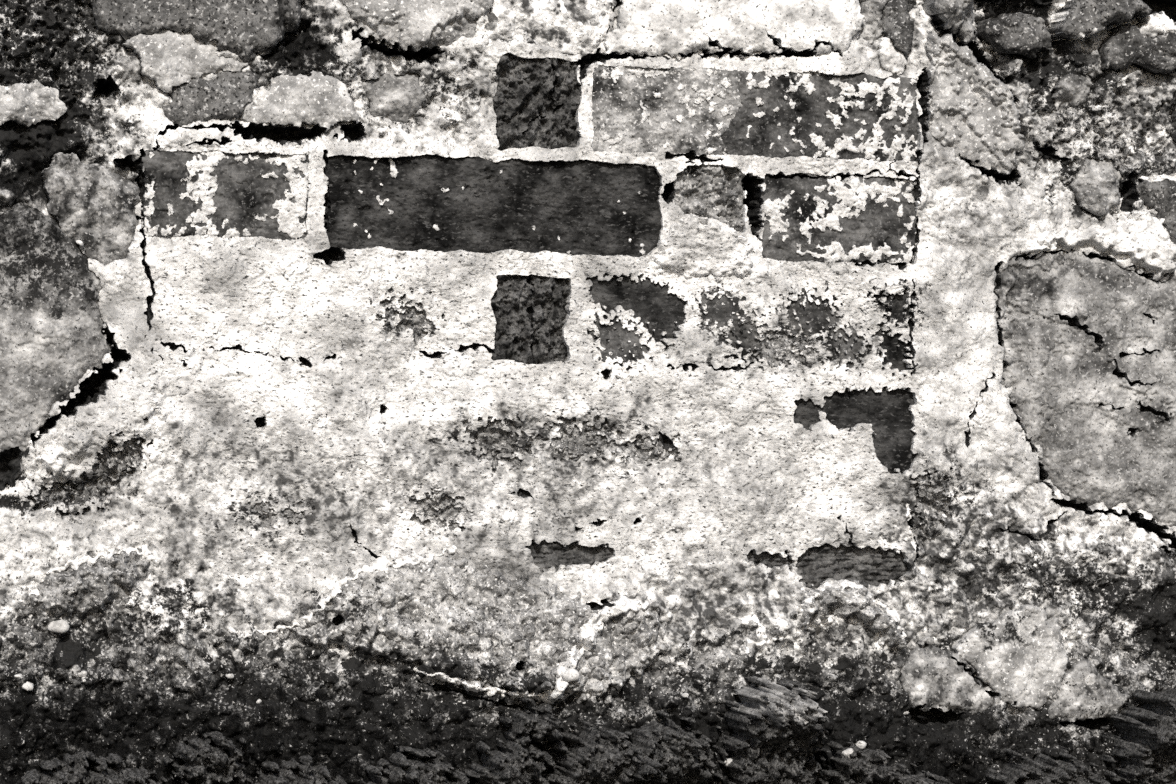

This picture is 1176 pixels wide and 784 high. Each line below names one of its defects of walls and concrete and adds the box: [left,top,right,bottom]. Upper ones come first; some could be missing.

peeling [600,131,624,148]
peeling [601,66,669,83]
peeling [640,92,661,123]
peeling [660,68,732,154]
peeling [746,71,918,162]
peeling [141,150,309,240]
peeling [358,158,398,214]
peeling [741,173,917,265]
flaking render [586,273,965,545]
crack [964,250,1173,541]
flaking render [525,539,614,573]
flaking render [747,543,908,590]